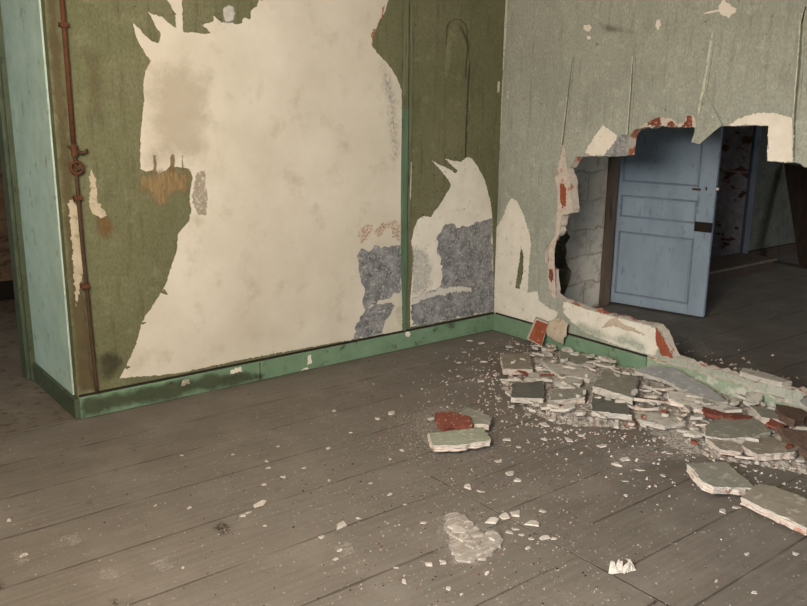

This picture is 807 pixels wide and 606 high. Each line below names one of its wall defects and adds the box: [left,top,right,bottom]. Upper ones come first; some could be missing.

spalling [703,0,737,18]
crack [792,7,807,161]
spalling [639,115,696,128]
spalling [729,112,794,163]
peeling [88,170,107,218]
peeling [120,0,673,386]
peeling [67,199,83,306]